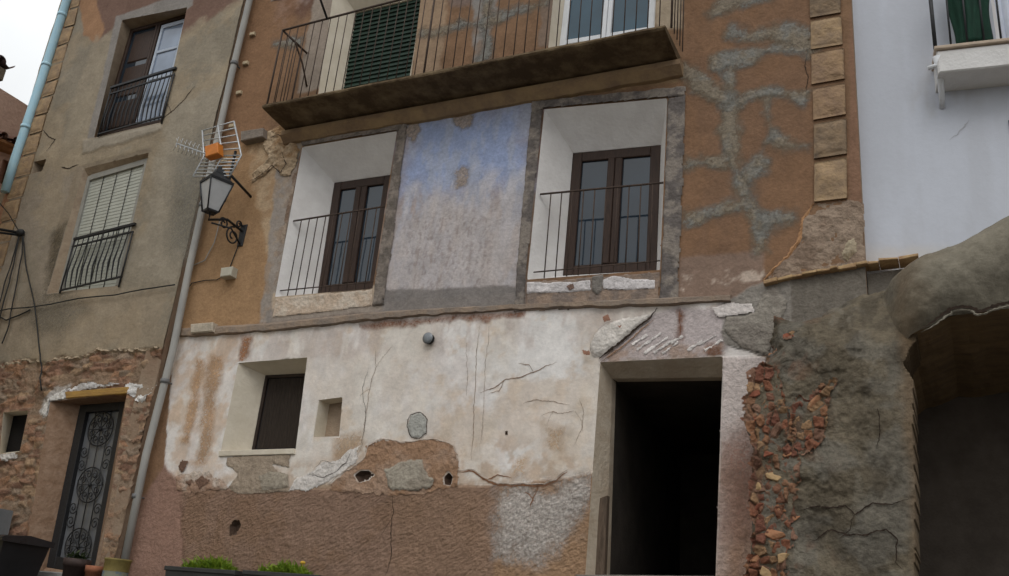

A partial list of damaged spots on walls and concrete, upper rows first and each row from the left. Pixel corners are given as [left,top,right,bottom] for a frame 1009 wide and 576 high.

flaking render [248,125,300,244]
crack [920,301,1009,332]
peeling [0,453,18,462]
peeling [42,381,152,416]
peeling [289,372,459,496]
crack [463,328,567,507]
crack [525,399,584,441]
spalling [740,331,838,576]